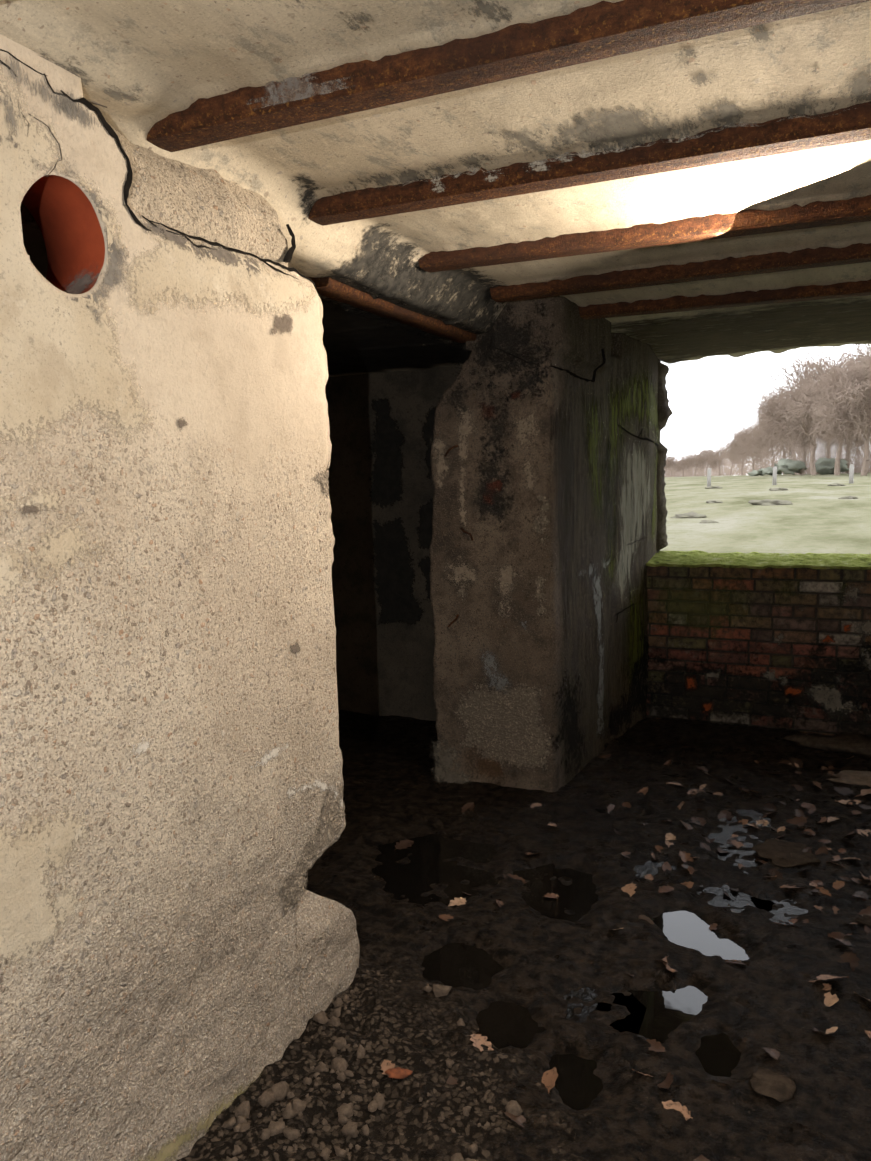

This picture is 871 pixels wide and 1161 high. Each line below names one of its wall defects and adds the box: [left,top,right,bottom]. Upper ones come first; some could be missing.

crack [0,49,321,297]
water stain [317,223,505,347]
crack [617,423,659,446]
water stain [550,396,871,782]